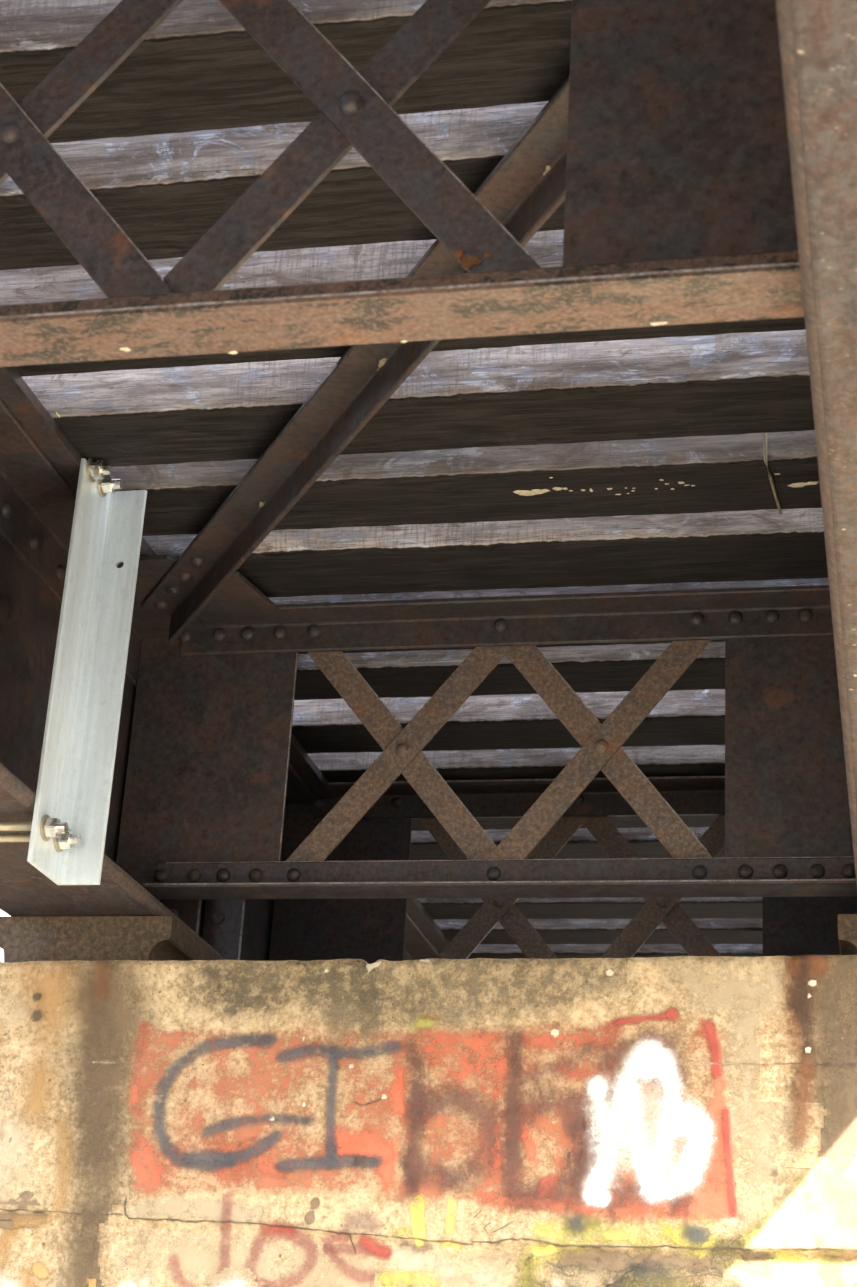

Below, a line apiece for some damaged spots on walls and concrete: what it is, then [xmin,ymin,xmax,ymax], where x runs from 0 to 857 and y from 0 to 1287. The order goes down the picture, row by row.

leakage [10,967,141,1287]
rust [788,955,826,1156]
leakage [782,956,857,1287]
crack [0,1193,857,1287]
leakage [692,1245,792,1287]